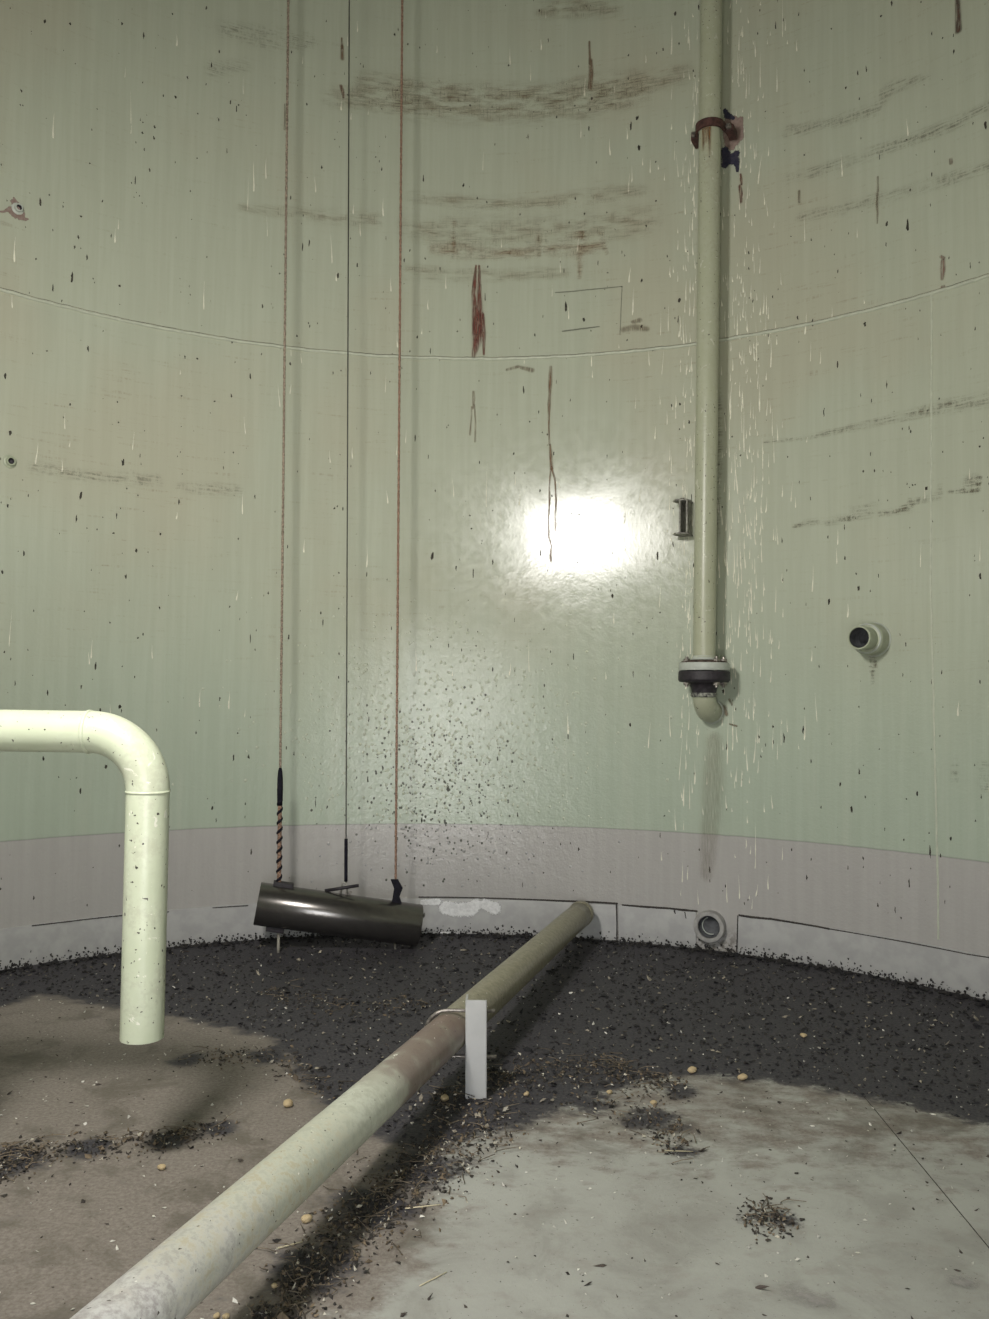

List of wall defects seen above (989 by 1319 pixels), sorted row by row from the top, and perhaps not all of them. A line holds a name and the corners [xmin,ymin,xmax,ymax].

corrosion [472,265,485,357]
corrosion [548,366,557,562]